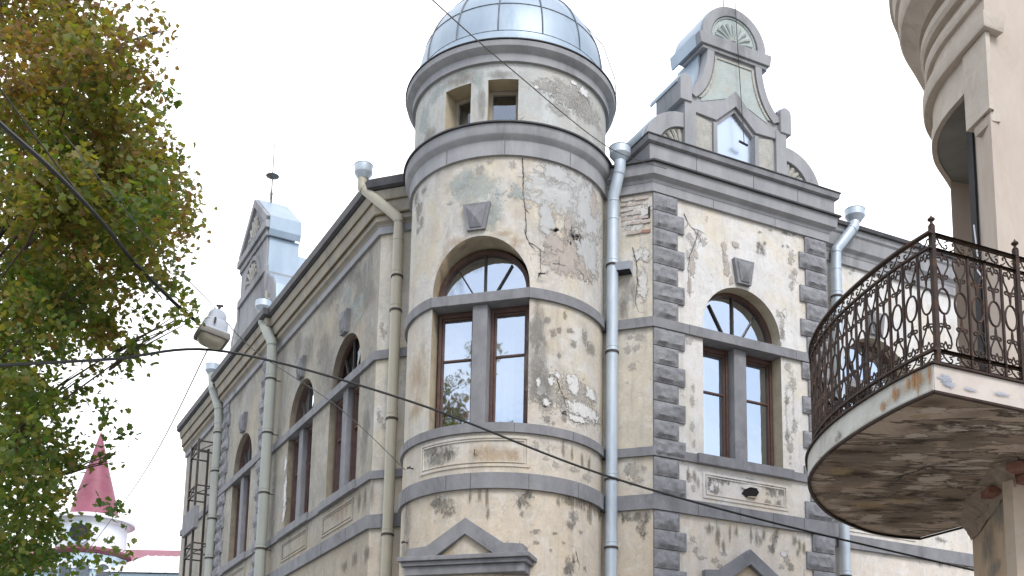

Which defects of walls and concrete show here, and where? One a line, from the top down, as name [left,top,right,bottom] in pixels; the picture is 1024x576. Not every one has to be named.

peeling [534,80,590,100]
crack [522,158,566,270]
peeling [488,160,602,284]
flaking render [619,195,653,303]
crack [684,214,705,292]
peeling [534,371,602,426]
rust [881,365,930,411]
spalling [887,453,931,461]
spalling [897,472,955,491]
spalling [836,506,902,534]